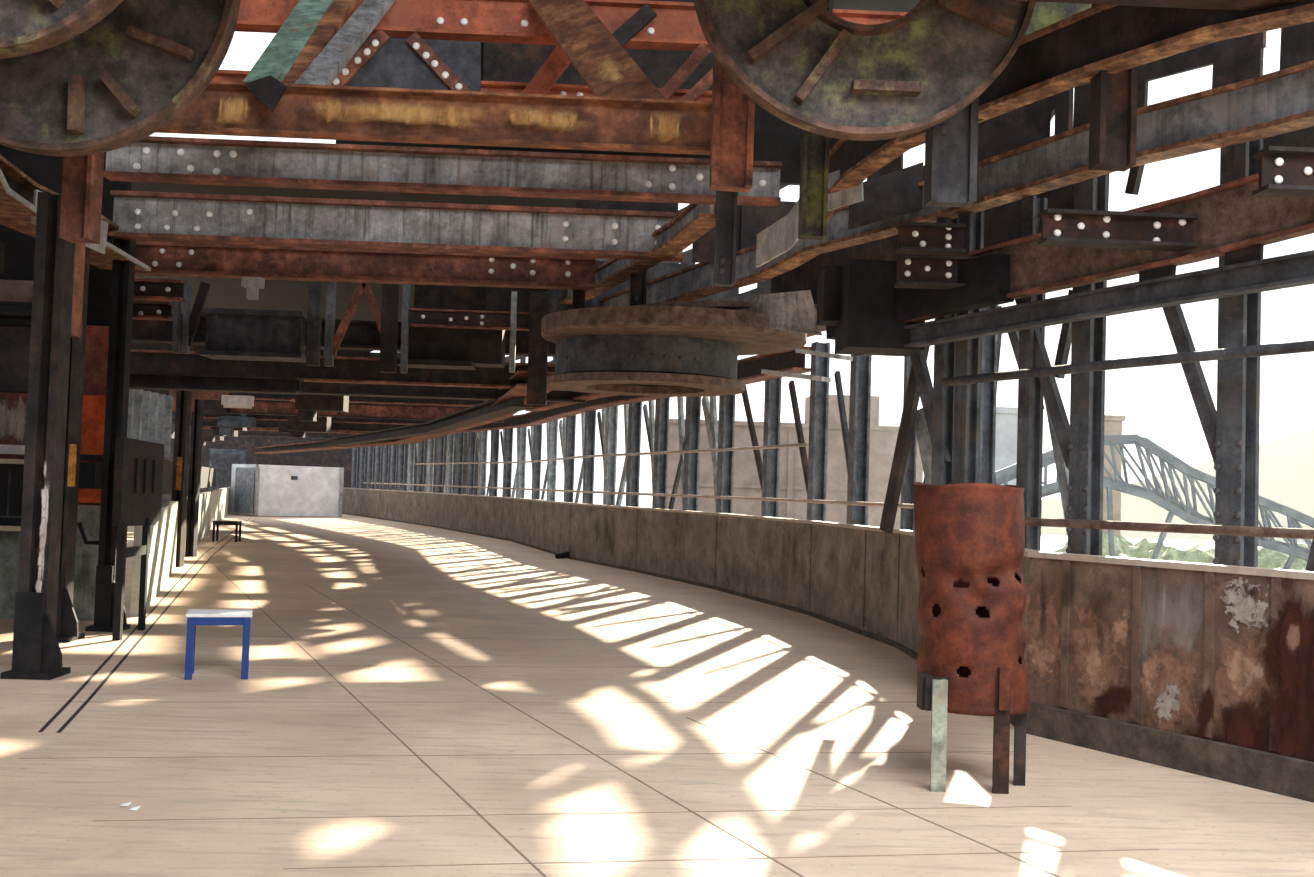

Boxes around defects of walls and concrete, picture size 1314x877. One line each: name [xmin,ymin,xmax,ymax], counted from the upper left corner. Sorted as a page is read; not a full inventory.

rust [315,101,475,125]
rust [510,110,577,128]
rust [650,116,679,140]
peeling [0,395,26,443]
peeling [1221,576,1269,634]
rust [1023,579,1314,762]